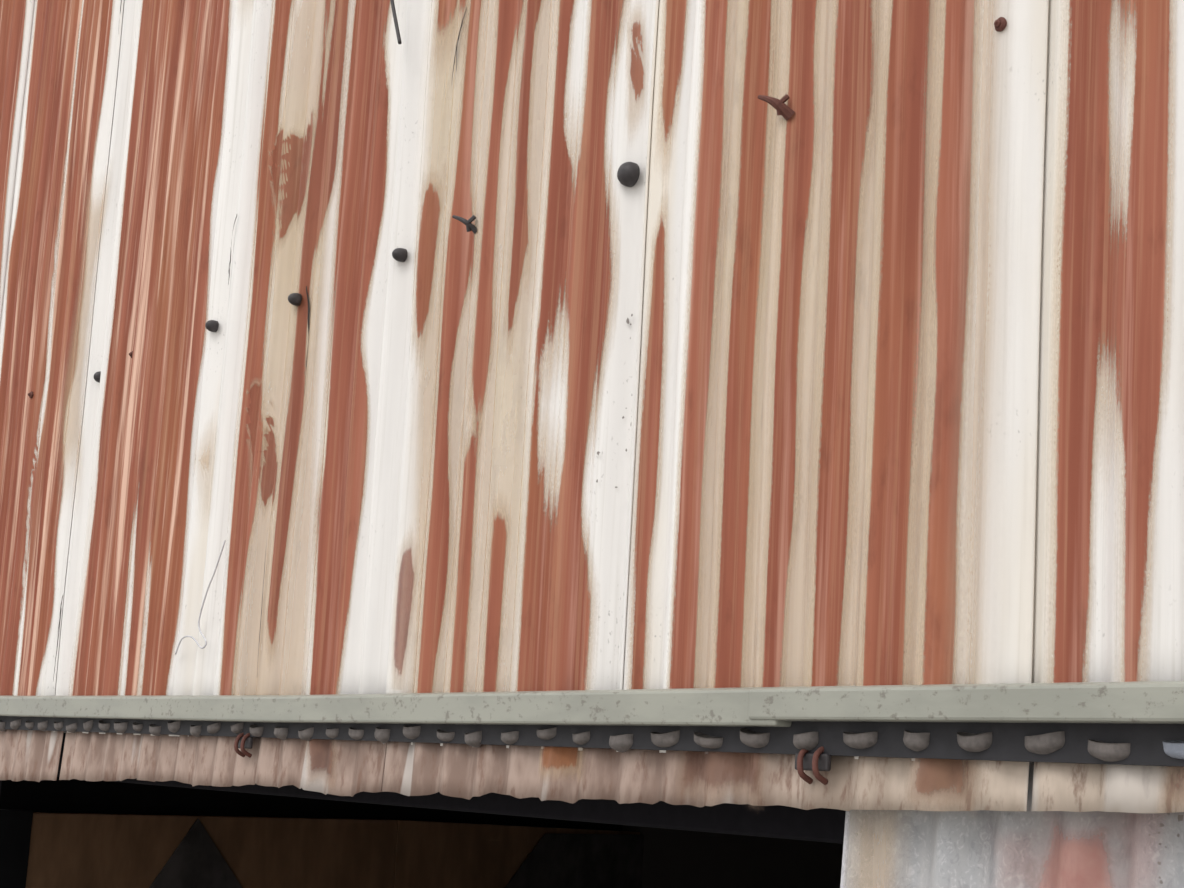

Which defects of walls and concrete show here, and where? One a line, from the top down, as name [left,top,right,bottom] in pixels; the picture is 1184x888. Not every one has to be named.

rust [0,0,113,696]
rust [72,0,230,696]
rust [220,0,390,695]
rust [394,0,541,693]
rust [517,0,644,691]
rust [631,215,665,689]
rust [662,0,687,143]
rust [670,0,728,689]
rust [714,0,774,688]
rust [761,0,817,687]
rust [811,0,977,686]
rust [1053,0,1171,683]